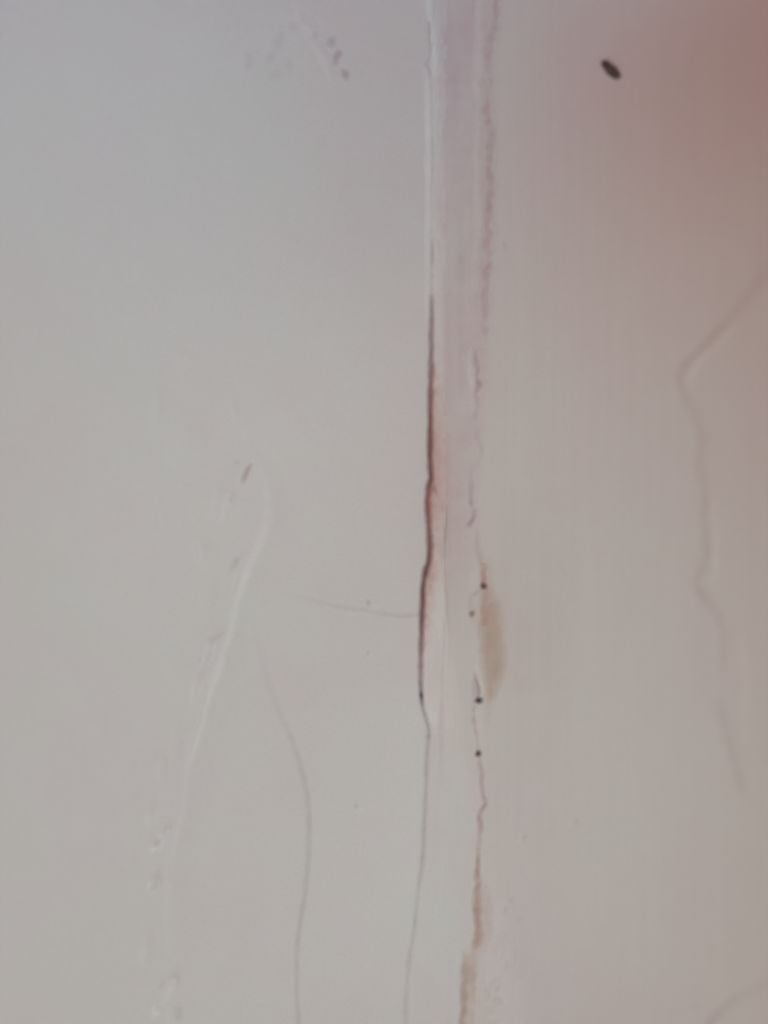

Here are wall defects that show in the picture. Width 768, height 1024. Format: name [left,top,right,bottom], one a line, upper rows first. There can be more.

crack [400,235,442,1024]
corrosion [457,758,496,1024]
corrosion [466,556,509,726]
water stain [433,0,591,904]